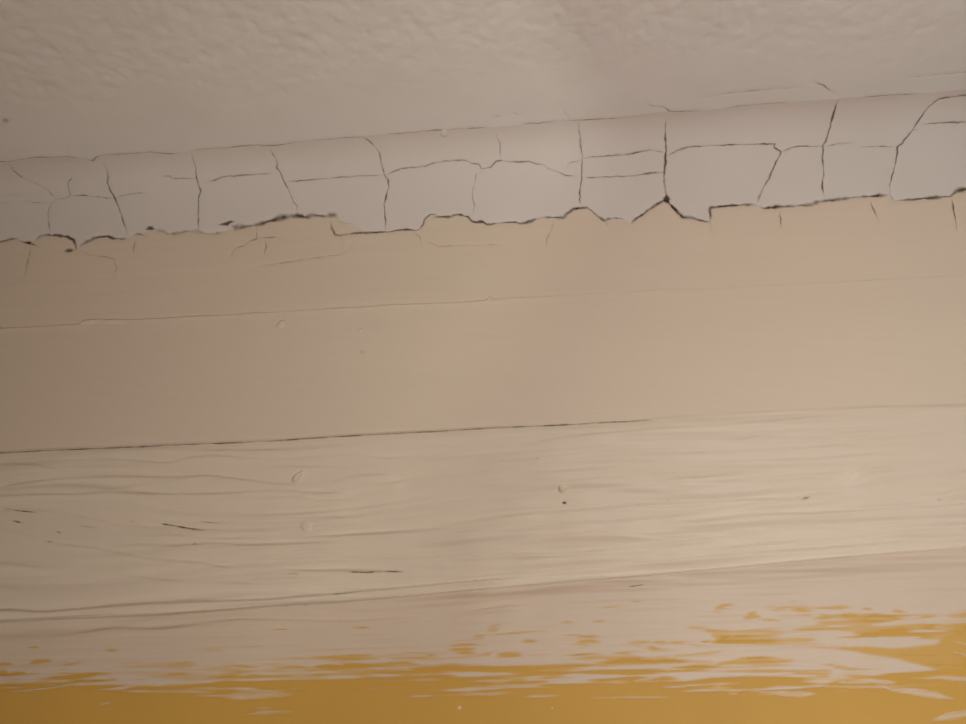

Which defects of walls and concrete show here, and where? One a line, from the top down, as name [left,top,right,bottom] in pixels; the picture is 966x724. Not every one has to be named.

crack [635,97,966,222]
crack [0,188,124,244]
crack [260,170,603,234]